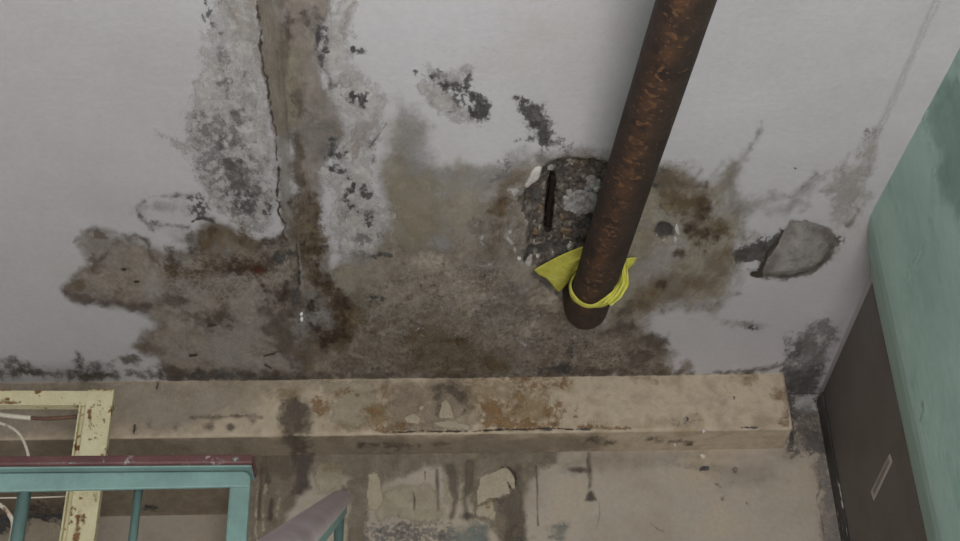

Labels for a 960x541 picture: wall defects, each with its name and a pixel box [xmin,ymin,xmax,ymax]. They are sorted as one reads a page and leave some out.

crack [256,4,301,285]
damp [0,0,741,541]
spalling [499,156,608,316]
rust [655,168,730,246]
rust [615,277,674,368]
rust [312,379,411,433]
rust [473,376,631,432]
damp [741,319,839,458]
peeling [366,473,466,525]
peeling [456,466,517,541]